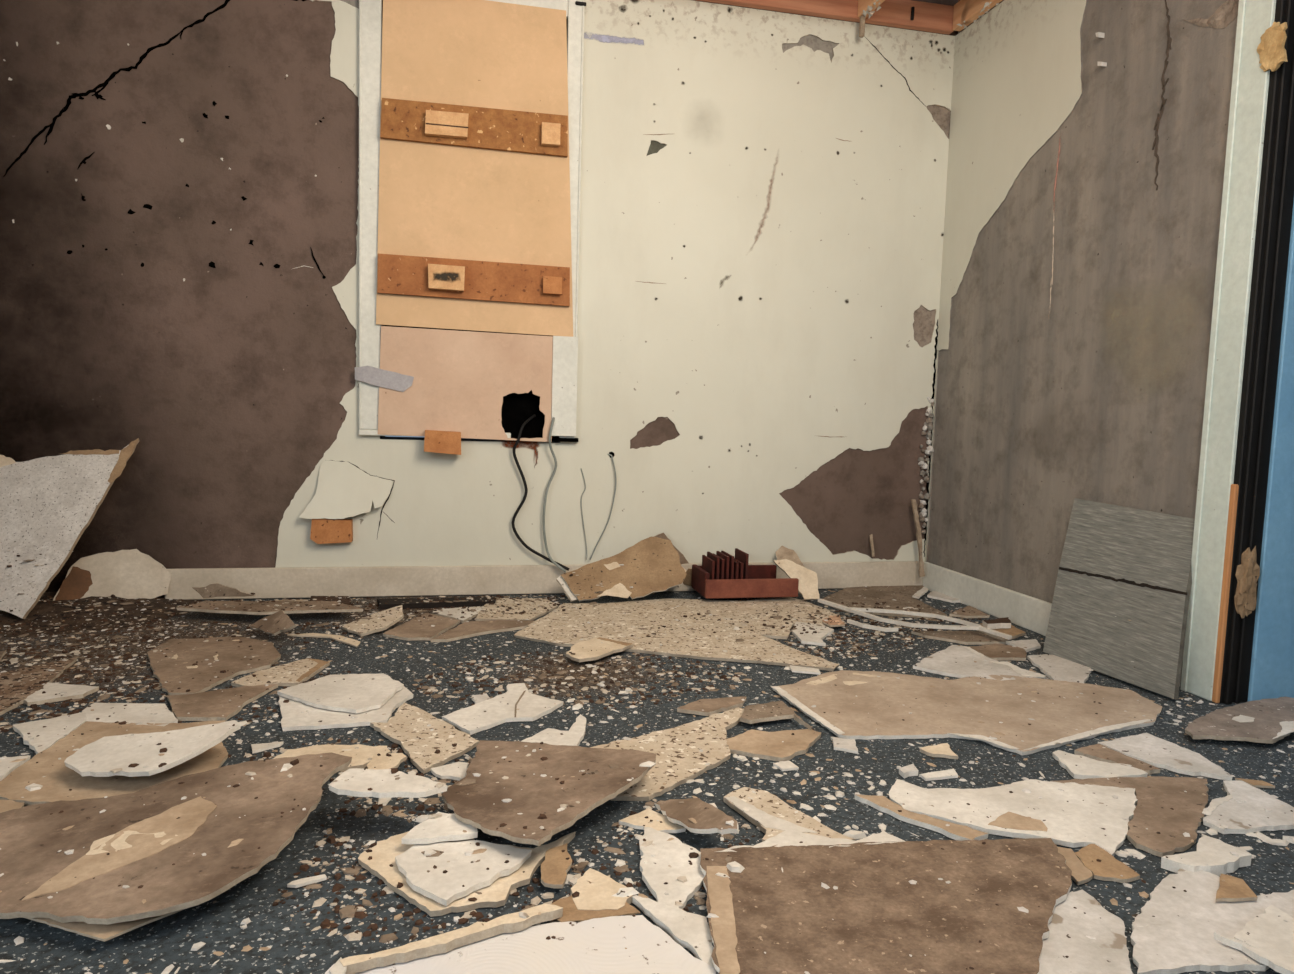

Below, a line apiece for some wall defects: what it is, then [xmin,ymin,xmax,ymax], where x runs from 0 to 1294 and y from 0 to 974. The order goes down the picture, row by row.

crack [3,0,230,177]
crack [1152,0,1172,190]
spalling [1257,22,1288,72]
flaking render [0,0,359,569]
flaking render [779,0,1238,603]
flaking render [630,417,679,449]